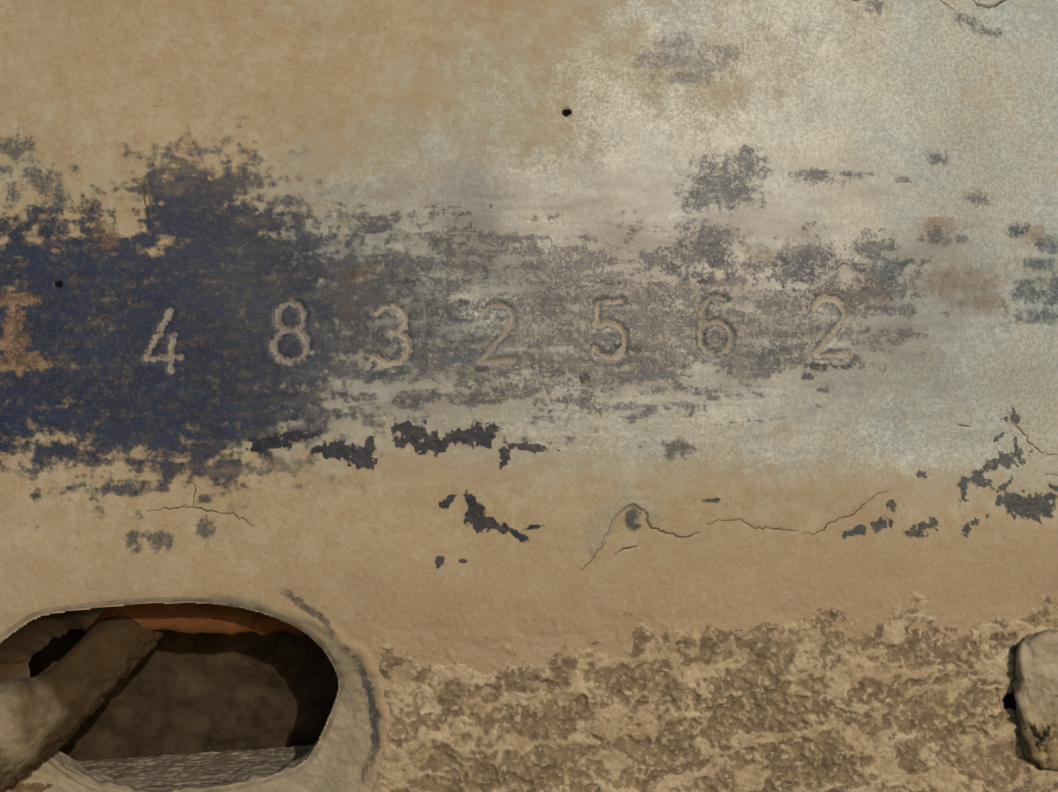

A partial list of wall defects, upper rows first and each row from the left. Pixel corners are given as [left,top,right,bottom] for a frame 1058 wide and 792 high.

crack [941,0,1006,9]
peeling [1013,235,1058,324]
peeling [0,137,928,499]
peeling [957,407,1058,537]
crack [1010,418,1058,476]
peeling [439,490,544,542]
crack [581,491,887,571]
peeling [842,499,899,539]
peeling [905,517,938,537]